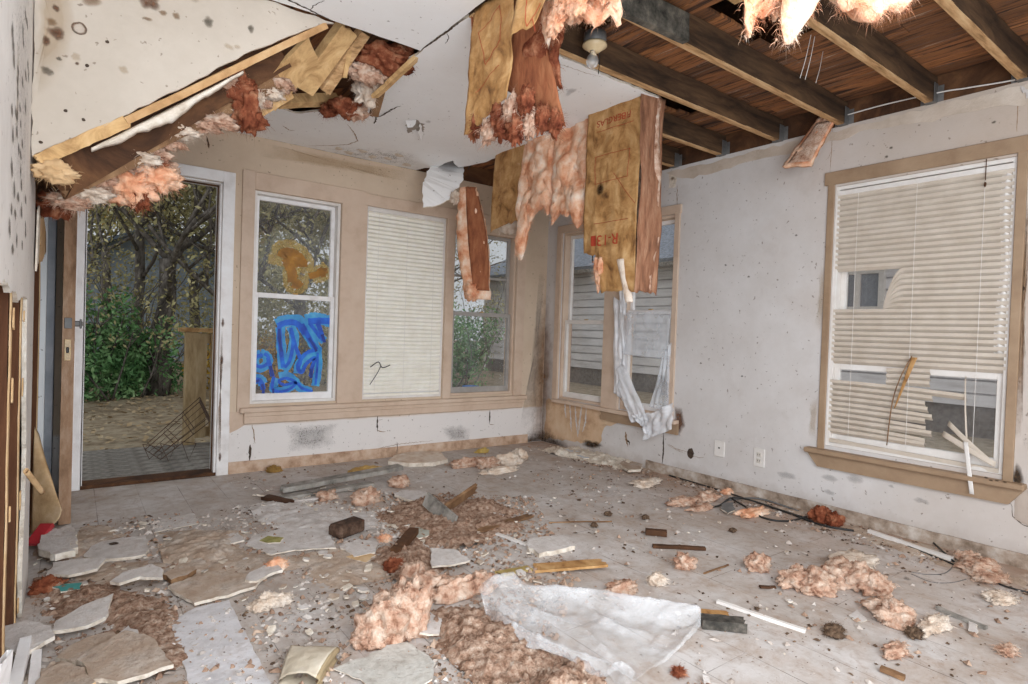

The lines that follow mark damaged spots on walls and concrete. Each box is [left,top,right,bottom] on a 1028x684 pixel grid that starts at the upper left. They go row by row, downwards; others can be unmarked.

water stain [43,6,87,45]
water stain [141,0,179,20]
water stain [9,12,29,253]
spalling [30,158,82,188]